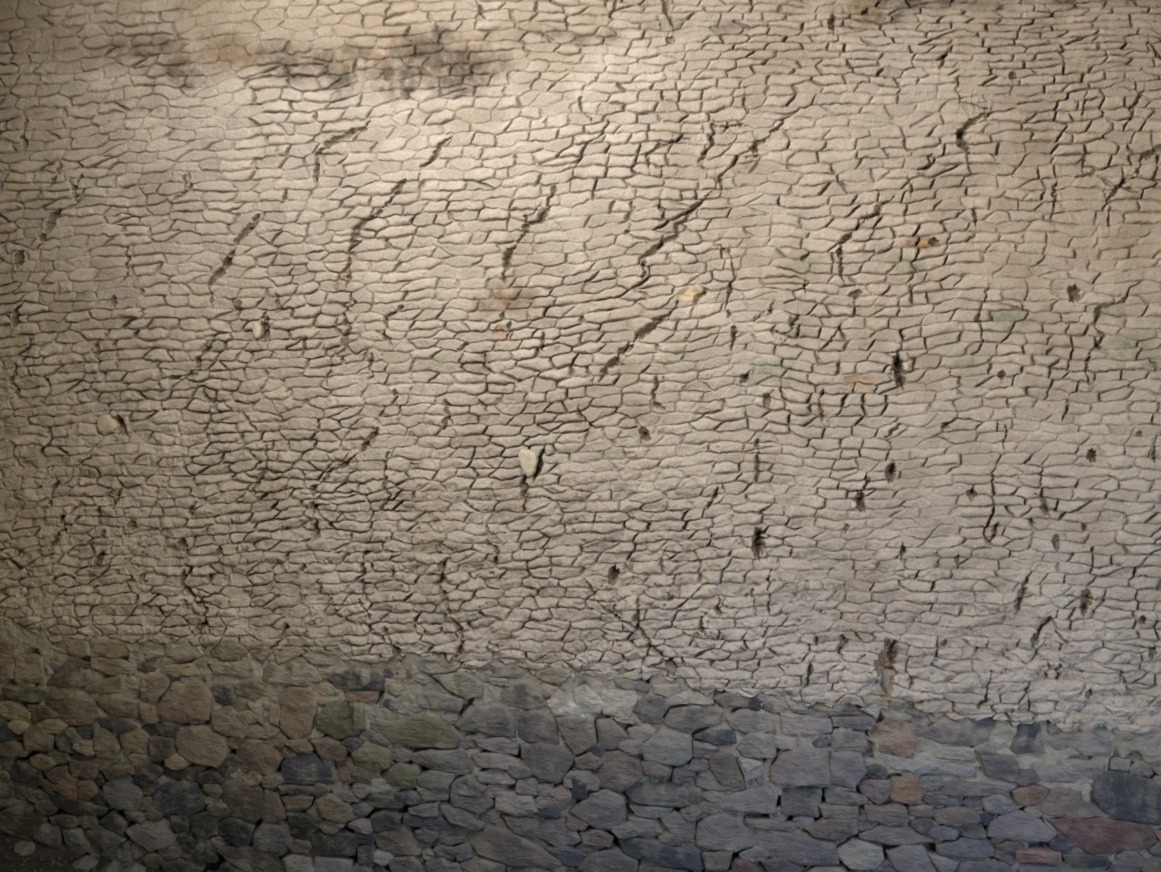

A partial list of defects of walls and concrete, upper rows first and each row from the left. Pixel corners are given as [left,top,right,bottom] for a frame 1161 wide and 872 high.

crack [207,190,288,304]
crack [313,118,371,182]
crack [302,138,450,403]
crack [502,188,557,282]
crack [599,245,806,381]
crack [641,96,785,277]
crack [838,155,931,281]
crack [939,54,990,153]
crack [1062,282,1140,418]
crack [1105,145,1161,225]
crack [310,430,392,535]
crack [1014,578,1049,646]